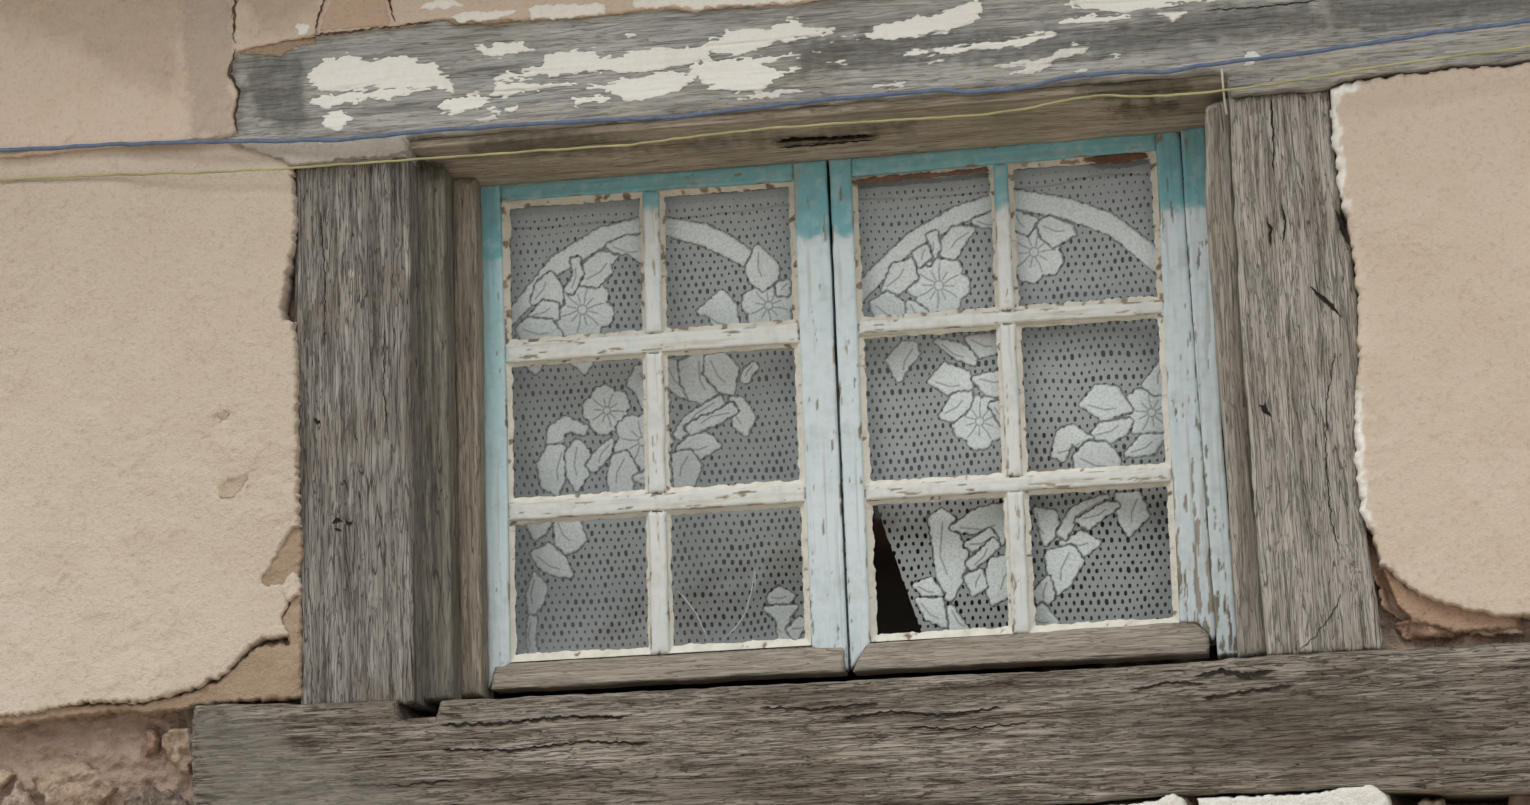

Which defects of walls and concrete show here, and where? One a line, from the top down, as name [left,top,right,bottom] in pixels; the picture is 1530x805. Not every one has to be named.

crack [315,0,435,36]
peeling [240,0,1215,143]
spalling [0,523,304,727]
spalling [1366,530,1525,634]